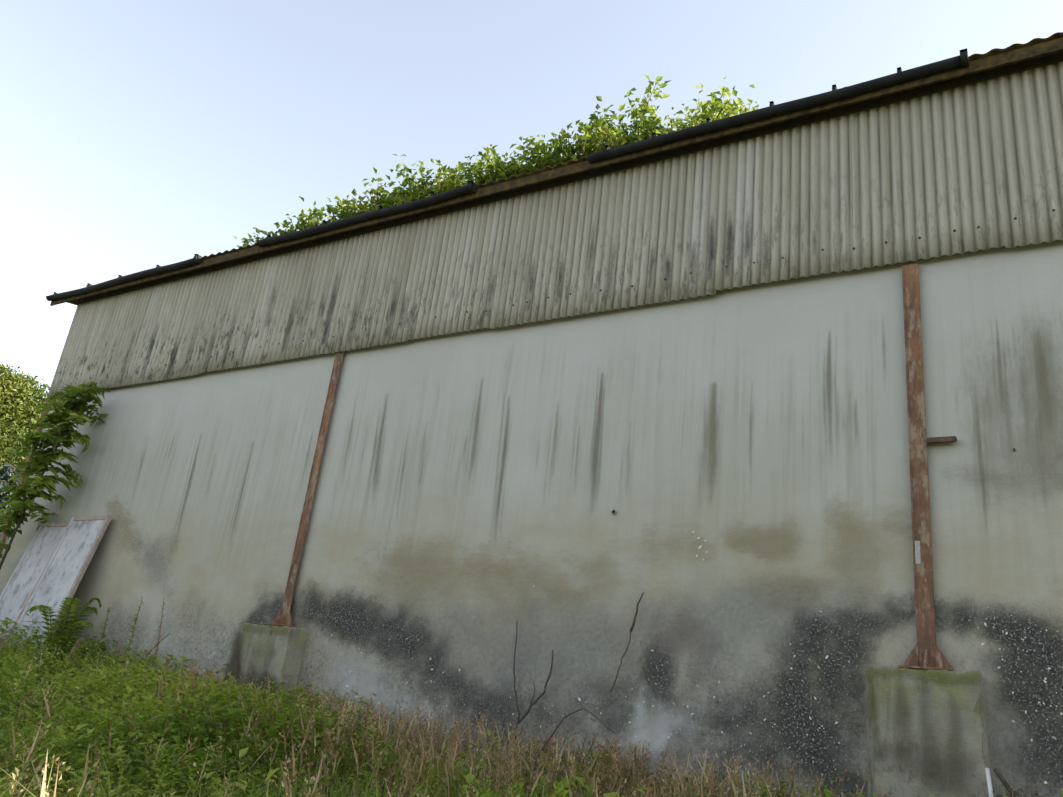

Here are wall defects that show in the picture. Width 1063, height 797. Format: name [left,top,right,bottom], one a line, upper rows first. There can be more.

damp [321,290,335,343]
damp [225,589,527,737]
damp [578,605,915,797]
damp [935,604,1063,787]